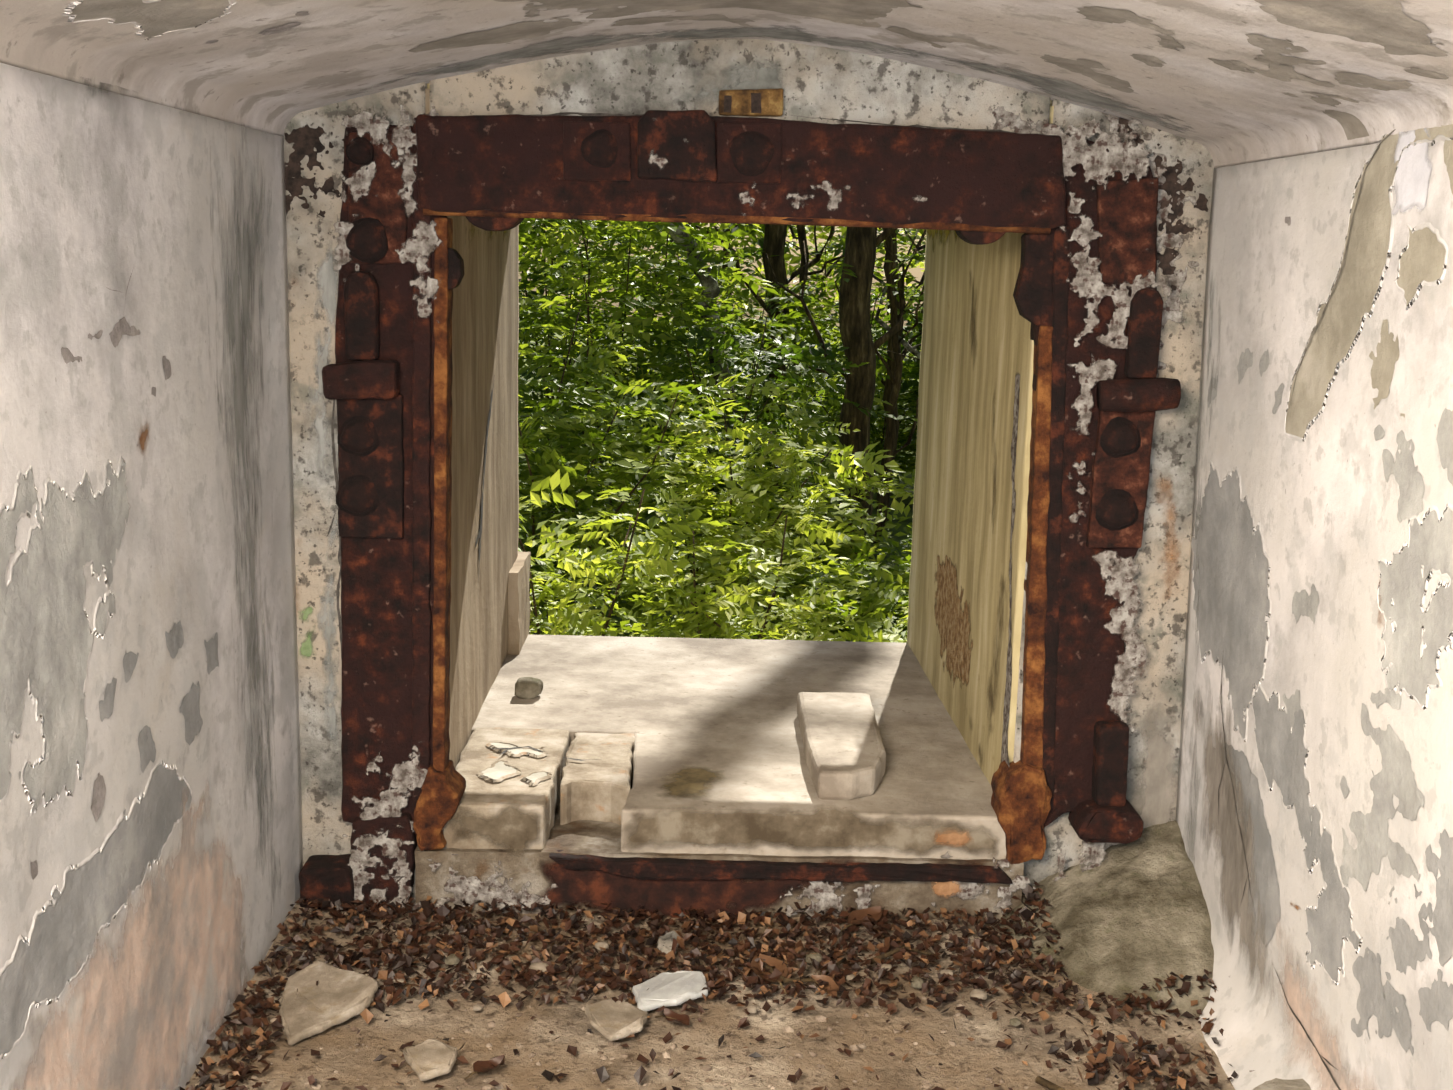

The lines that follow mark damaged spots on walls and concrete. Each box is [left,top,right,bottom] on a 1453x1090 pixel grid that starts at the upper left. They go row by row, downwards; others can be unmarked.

peeling [62,0,237,44]
peeling [408,0,999,53]
peeling [1077,6,1185,70]
peeling [328,162,376,282]
peeling [992,107,1202,378]
peeling [1191,0,1453,1055]
peeling [180,632,219,745]
peeling [0,453,192,1059]
peeling [343,742,558,915]
rust [541,861,858,921]
rust [935,831,970,846]
rust [933,864,979,897]